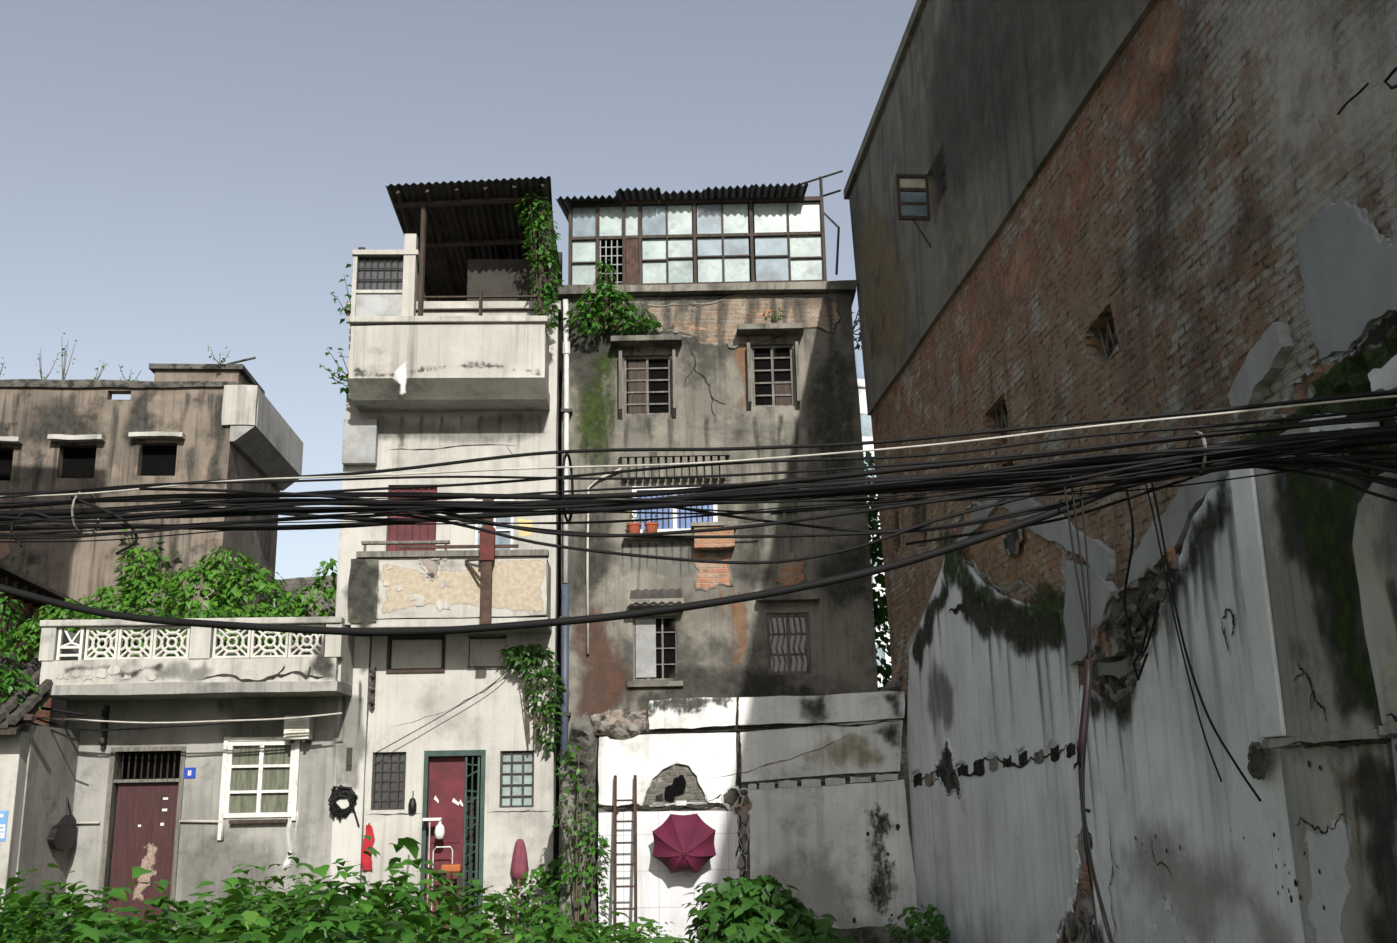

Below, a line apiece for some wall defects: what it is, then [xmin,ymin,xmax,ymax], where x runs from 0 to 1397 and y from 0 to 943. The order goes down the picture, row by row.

spalling [642,293,842,348]
crack [684,340,725,424]
spalling [1273,324,1397,471]
crack [197,666,326,682]
peeling [380,557,546,614]
flaking render [692,550,735,593]
leakage [912,582,1069,726]
spalling [1091,544,1179,703]
leakage [1274,454,1382,726]
leakage [1087,687,1134,797]
spalling [642,761,753,875]
leakage [869,805,897,914]